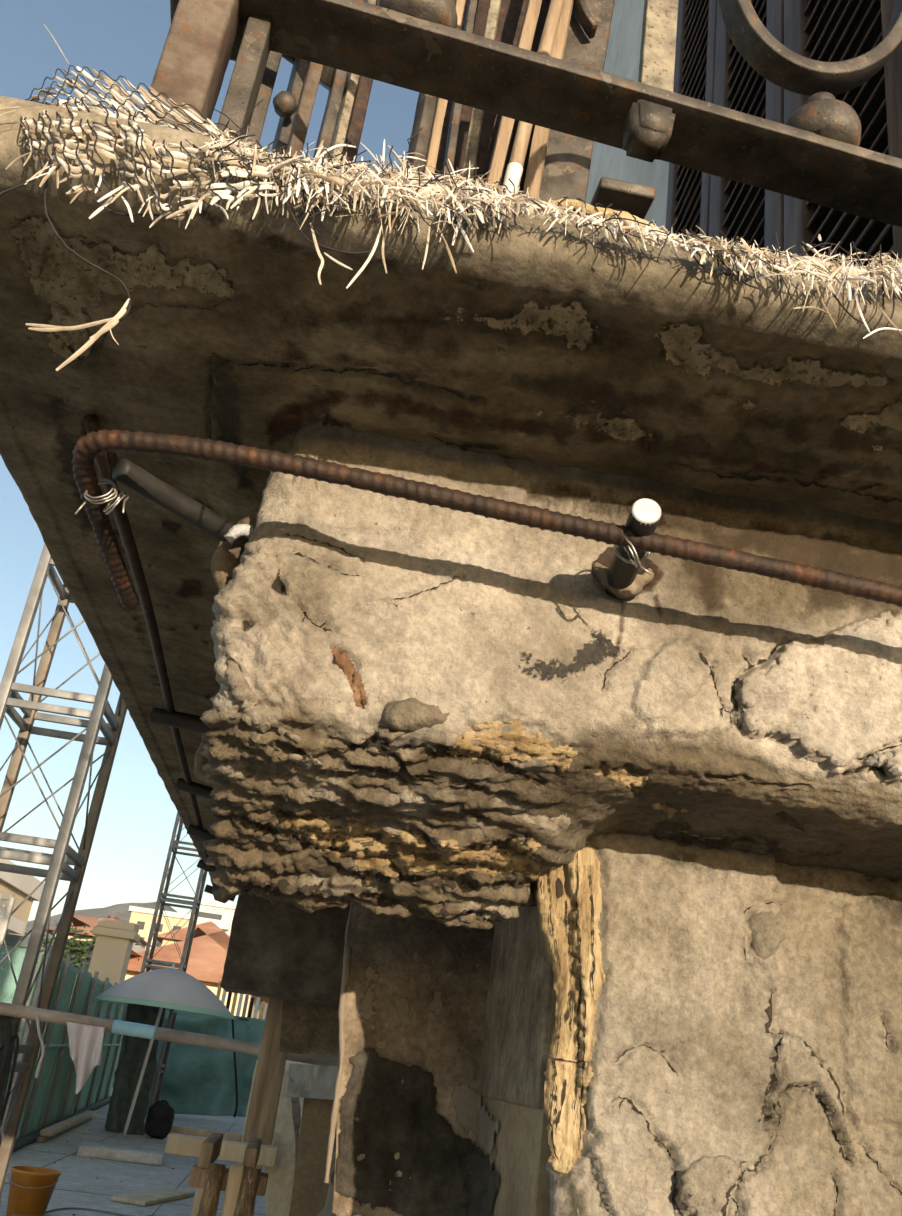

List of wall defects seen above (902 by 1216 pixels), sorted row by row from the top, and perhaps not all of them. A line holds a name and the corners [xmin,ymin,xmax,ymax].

water stain [177,207,221,226]
spalling [10,216,234,360]
water stain [210,354,241,445]
rust [269,392,558,444]
spalling [654,323,889,388]
spalling [71,411,902,859]
mould [519,630,621,683]
rust [643,569,661,614]
crack [696,642,783,724]
flaking render [273,817,606,1173]
crack [722,902,902,1216]
crack [611,1097,684,1216]